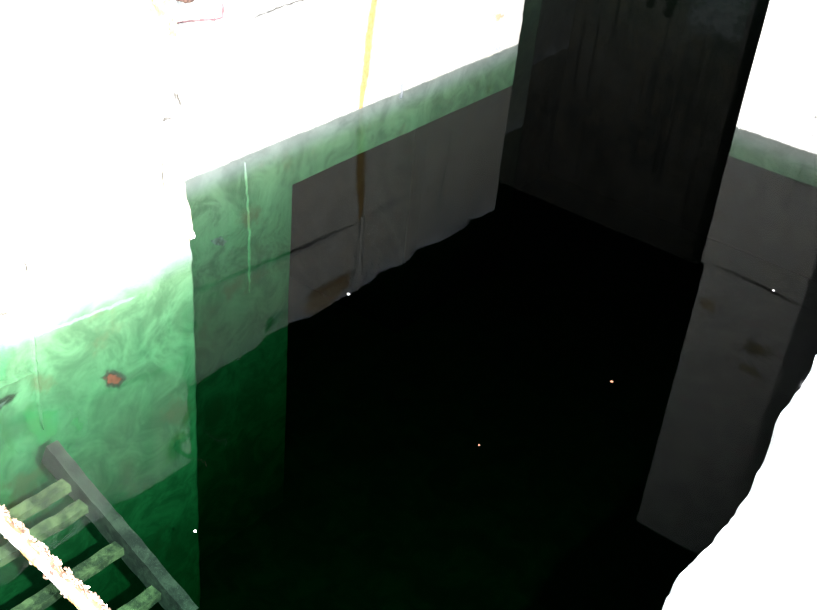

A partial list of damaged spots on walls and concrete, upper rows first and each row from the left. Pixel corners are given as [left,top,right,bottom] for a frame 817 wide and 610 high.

crack [183,0,307,50]
corrosion [359,0,377,109]
crack [0,394,15,409]
corrosion [103,370,126,388]